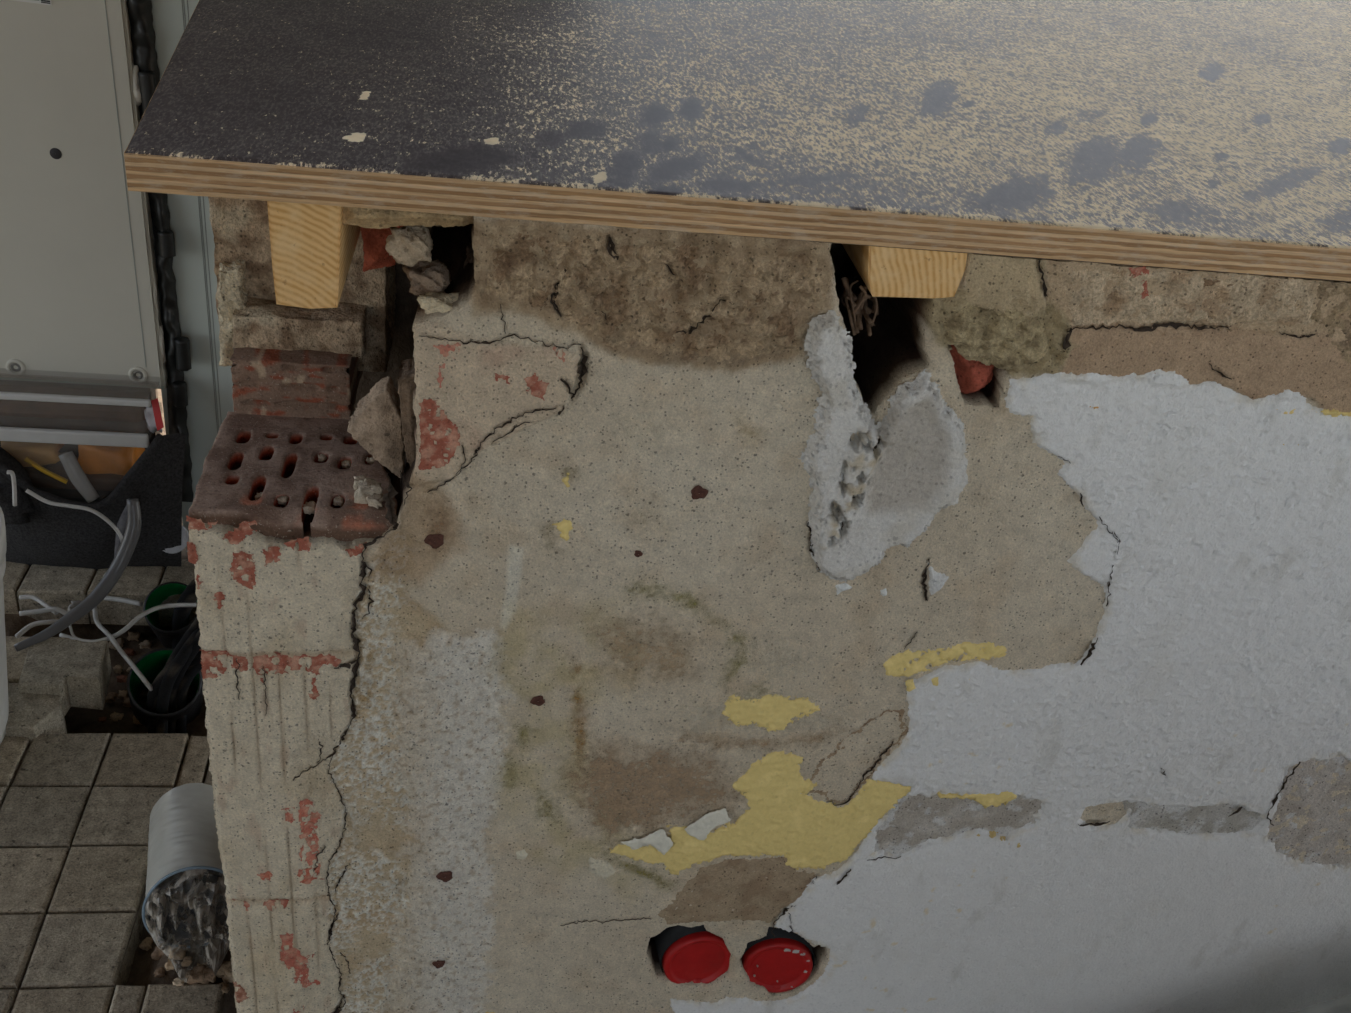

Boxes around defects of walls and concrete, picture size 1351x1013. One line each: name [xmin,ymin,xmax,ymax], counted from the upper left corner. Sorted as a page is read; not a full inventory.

flaking render [485,233,826,368]
crack [676,299,726,335]
flaking render [940,302,1054,394]
flaking render [928,563,949,595]
crack [293,269,588,1013]
peeling [721,694,820,732]
peeling [883,642,1007,692]
peeling [589,709,1042,925]
flaking render [1122,756,1351,868]